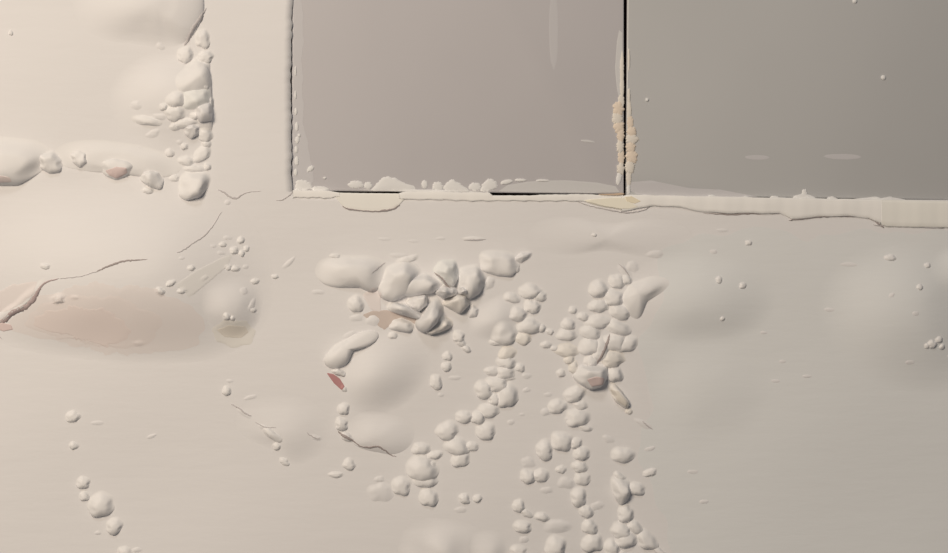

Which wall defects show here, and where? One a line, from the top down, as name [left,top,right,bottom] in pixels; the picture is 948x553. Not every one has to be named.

crack [177,189,293,253]
crack [0,259,147,339]
leakage [0,281,256,356]